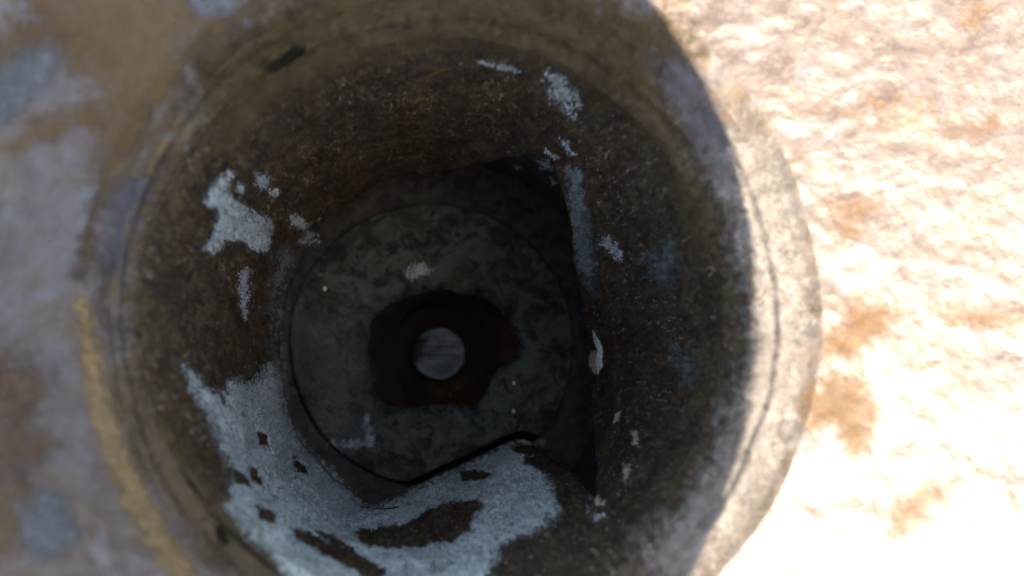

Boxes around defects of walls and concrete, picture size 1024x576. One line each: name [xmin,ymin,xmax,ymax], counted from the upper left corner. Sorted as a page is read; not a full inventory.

corrosion [825,304,894,356]
corrosion [364,286,515,414]
corrosion [804,372,874,456]
corrosion [230,465,265,488]
corrosion [292,456,308,475]
corrosion [458,469,490,482]
corrosion [510,444,569,475]
corrosion [256,504,276,523]
corrosion [294,498,484,576]